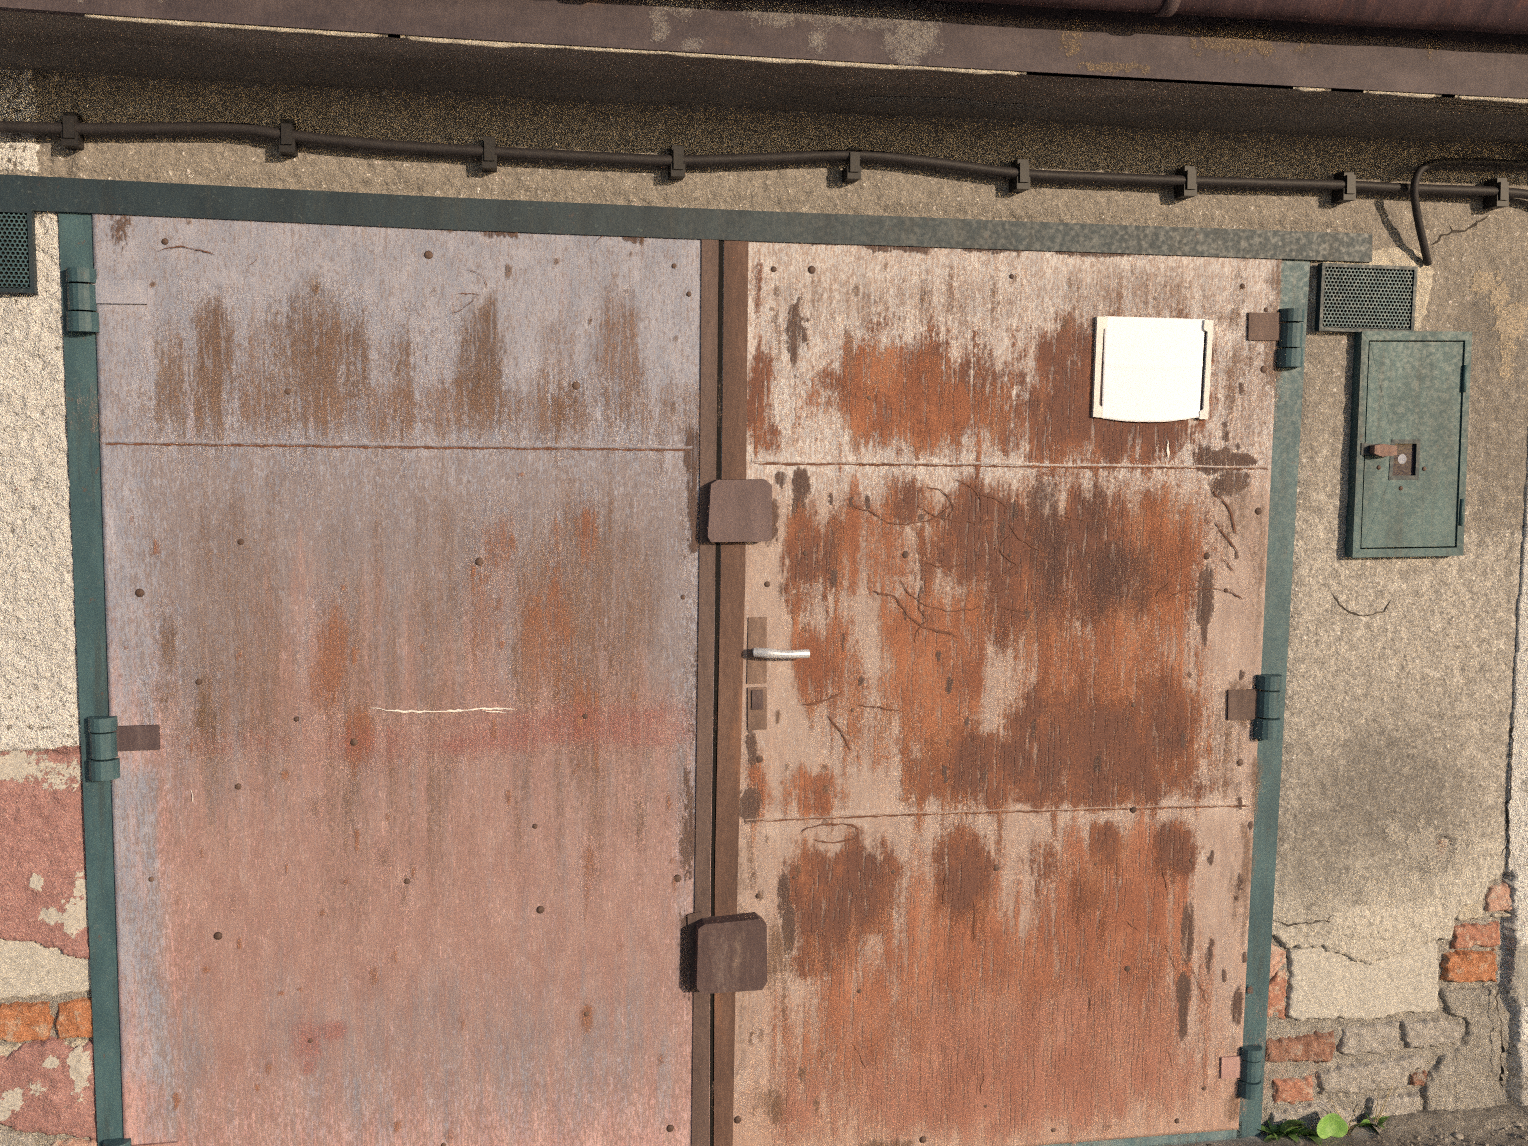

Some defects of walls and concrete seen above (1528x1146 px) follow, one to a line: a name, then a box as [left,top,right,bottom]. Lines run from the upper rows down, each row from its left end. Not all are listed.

rust [111,214,131,255]
rust [144,280,588,447]
rust [589,290,700,558]
peeling [0,744,83,792]
rust [310,482,663,887]
rust [668,768,696,889]
rust [738,245,1282,1146]
crack [1500,722,1515,870]
spalling [0,870,98,1146]
rust [678,911,695,1000]
spalling [1261,808,1528,1131]
crack [1492,984,1505,1087]